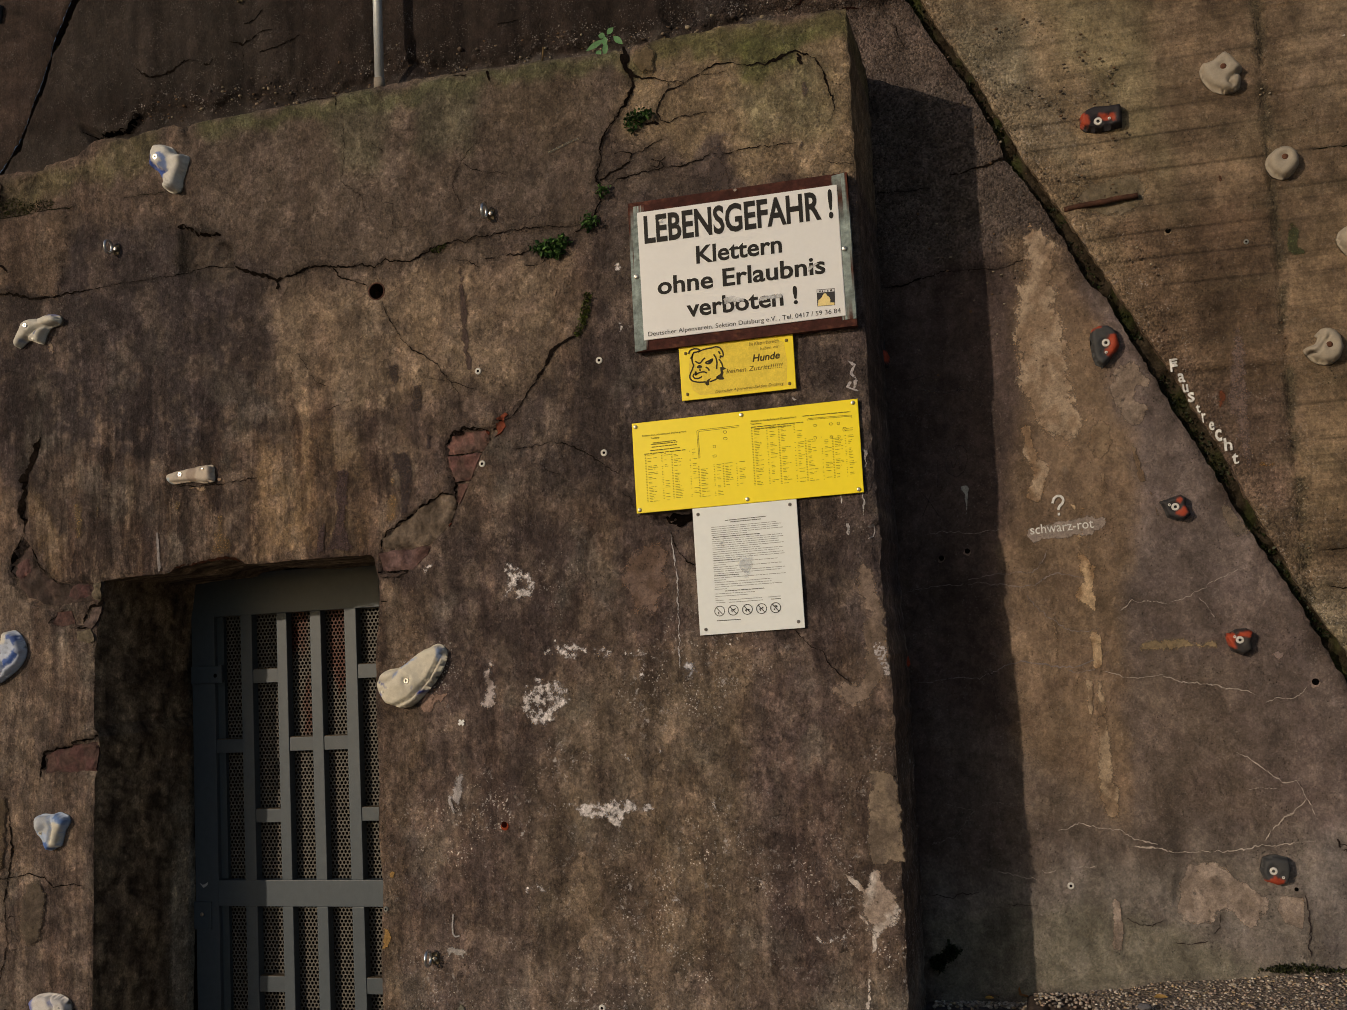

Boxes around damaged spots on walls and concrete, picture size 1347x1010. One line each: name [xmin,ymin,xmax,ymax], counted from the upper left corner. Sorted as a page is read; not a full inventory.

crack [0,47,835,629]
spalling [378,413,508,577]
spalling [16,546,103,643]
leakage [504,563,535,599]
efflorescence [522,678,567,725]
efflorescence [569,799,654,826]
efflorescence [846,870,901,953]